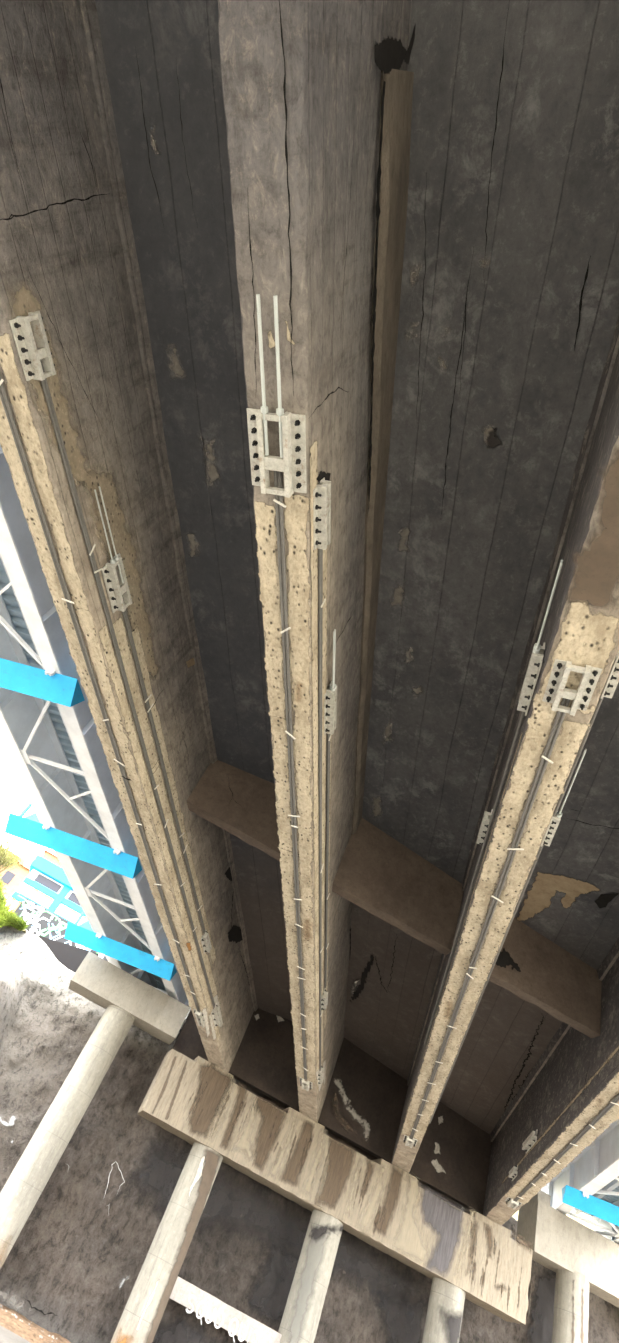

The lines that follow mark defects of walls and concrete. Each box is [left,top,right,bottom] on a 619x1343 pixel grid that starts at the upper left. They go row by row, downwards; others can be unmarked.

spalling [374,36,407,74]
crack [0,79,106,431]
crack [248,211,257,387]
crack [279,1,386,509]
spalling [398,449,619,1141]
water stain [136,1057,556,1343]
crack [504,1016,544,1110]
water stain [572,1280,584,1343]